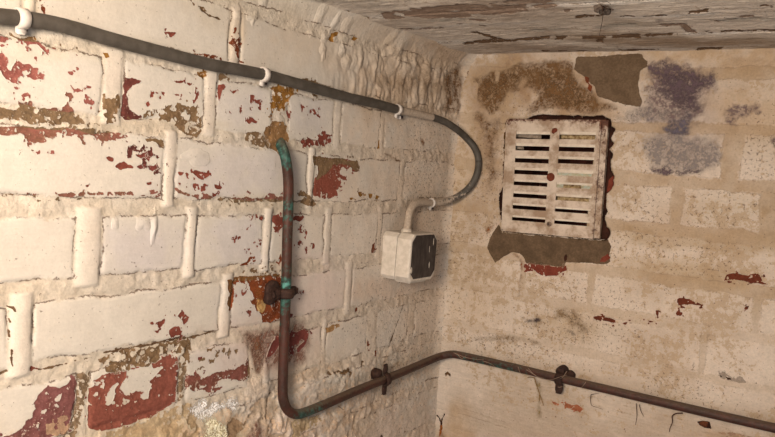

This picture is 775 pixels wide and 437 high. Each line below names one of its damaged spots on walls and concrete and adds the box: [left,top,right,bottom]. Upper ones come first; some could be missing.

spalling [381,0,603,45]
spalling [582,8,775,43]
peeling [0,32,207,201]
water stain [631,60,719,176]
water stain [726,105,761,123]
peeling [229,84,360,254]
peeling [174,168,283,243]
peeling [524,254,567,277]
peeling [724,271,772,290]
peeling [676,296,704,317]
peeling [0,309,253,437]
water stain [190,397,238,437]